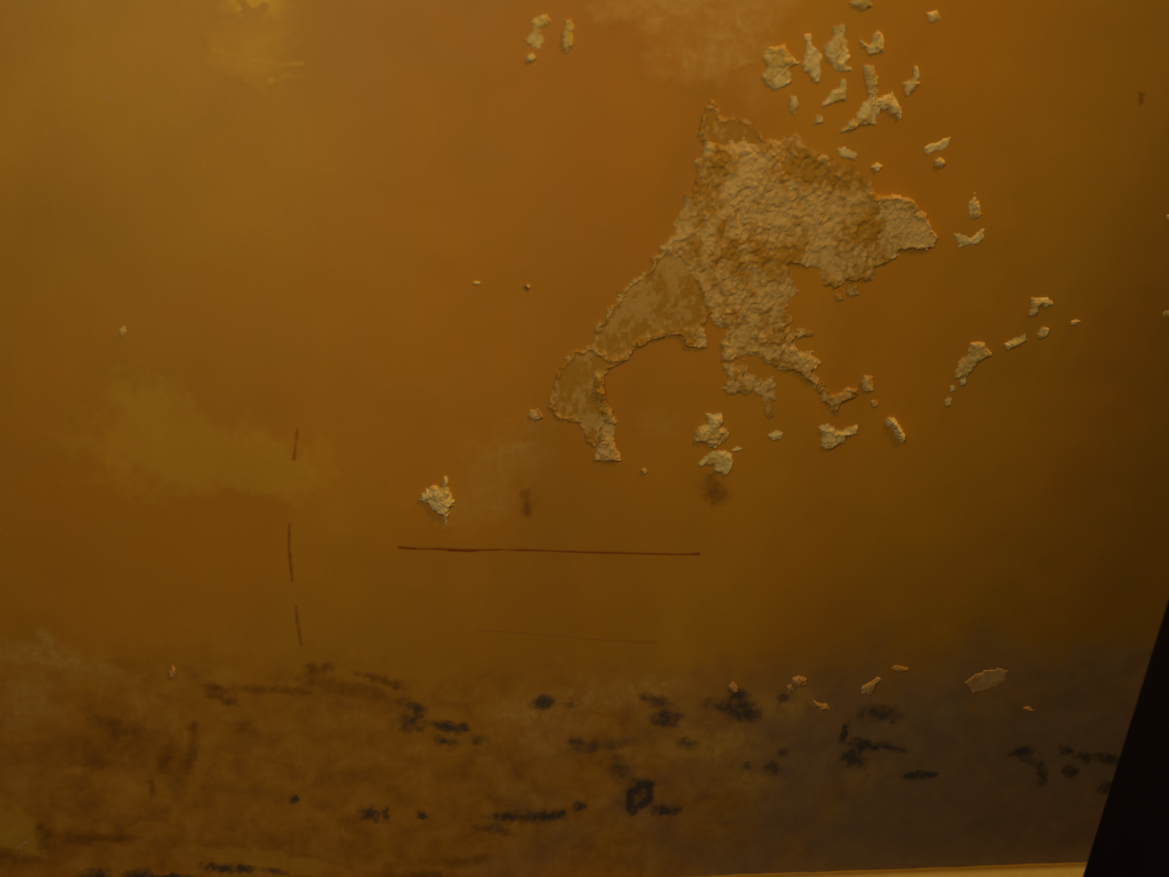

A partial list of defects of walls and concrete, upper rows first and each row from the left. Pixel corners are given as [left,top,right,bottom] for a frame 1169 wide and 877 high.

peeling [528,24,938,462]
peeling [953,192,985,248]
peeling [1004,297,1053,350]
peeling [944,341,992,406]
peeling [694,413,742,475]
peeling [420,476,455,524]
crack [410,547,699,555]
water stain [0,625,132,738]
water stain [485,672,835,801]
water stain [0,794,56,864]
water stain [627,781,681,815]
water stain [186,844,332,877]